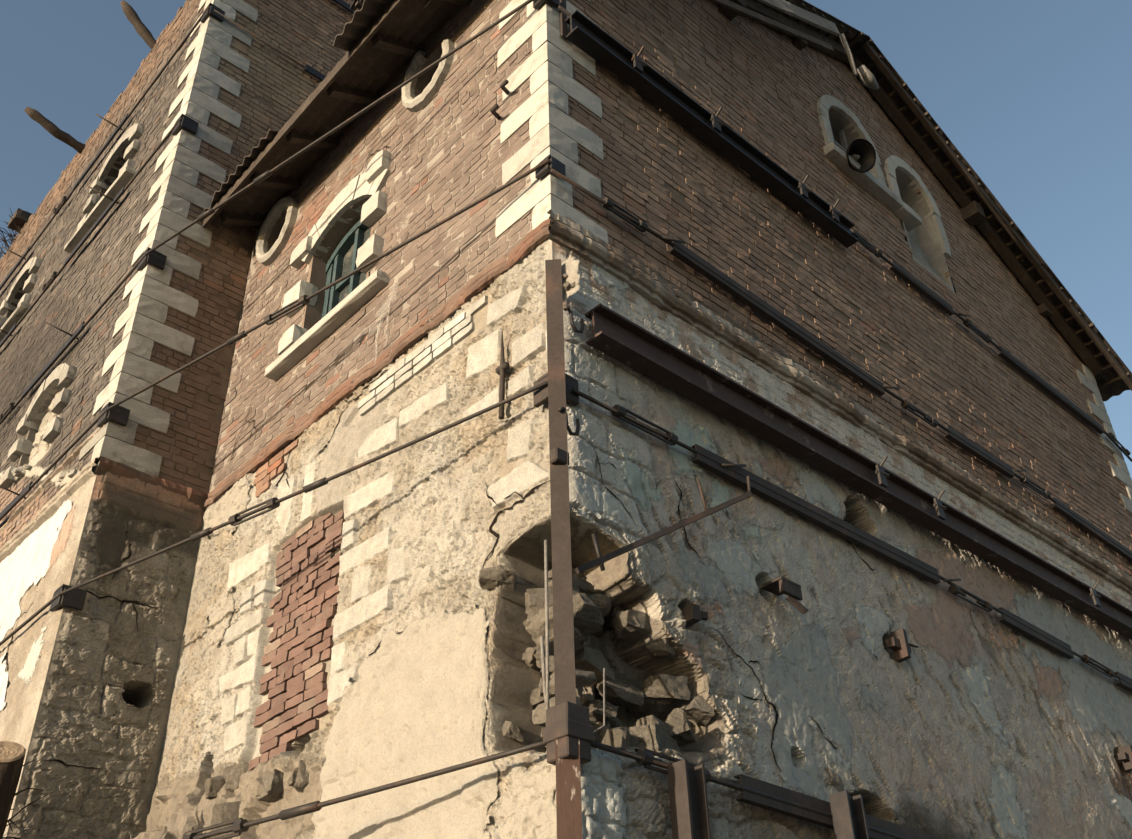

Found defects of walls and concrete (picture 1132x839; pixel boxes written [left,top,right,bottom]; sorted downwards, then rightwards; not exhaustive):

peeling [0,500,76,711]
spalling [0,464,79,487]
flaking render [134,537,557,839]
crack [483,480,550,590]
spalling [570,477,726,839]
crack [710,627,783,779]